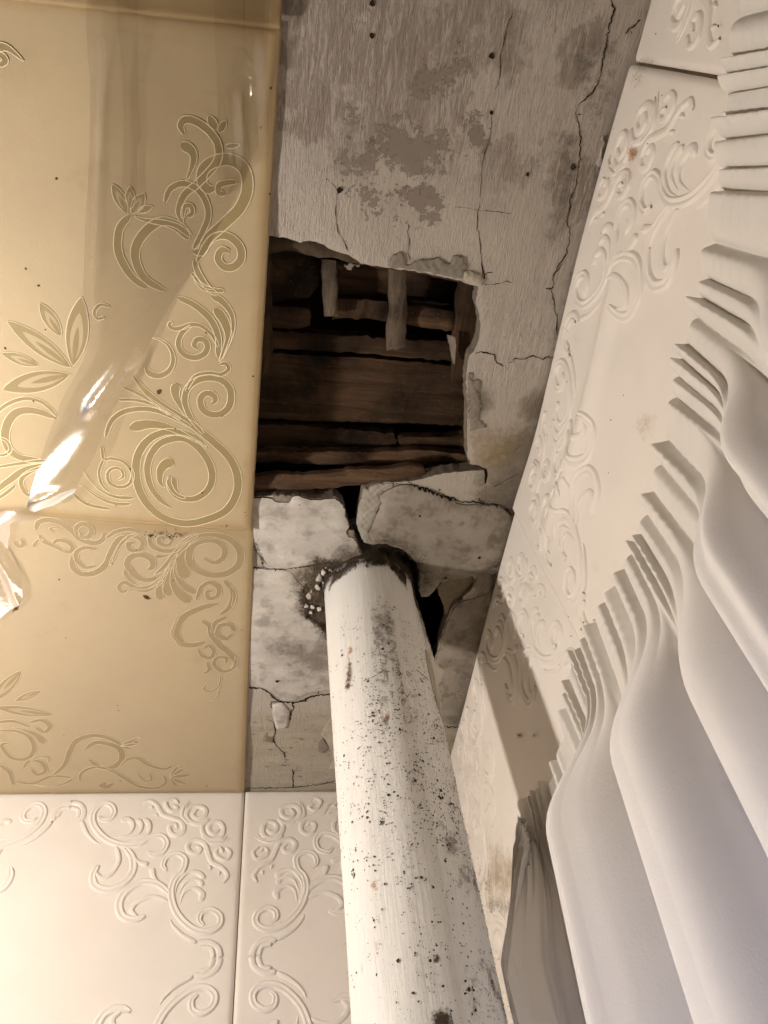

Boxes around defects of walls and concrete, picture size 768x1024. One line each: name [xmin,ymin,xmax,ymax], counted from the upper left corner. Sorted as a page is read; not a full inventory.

crack [464,117,512,285]
crack [476,0,640,366]
spalling [388,251,485,286]
spalling [273,493,293,502]
spalling [347,482,398,543]
crack [409,444,521,516]
peeling [304,567,332,614]
crack [249,687,334,789]
leakage [292,527,508,1024]